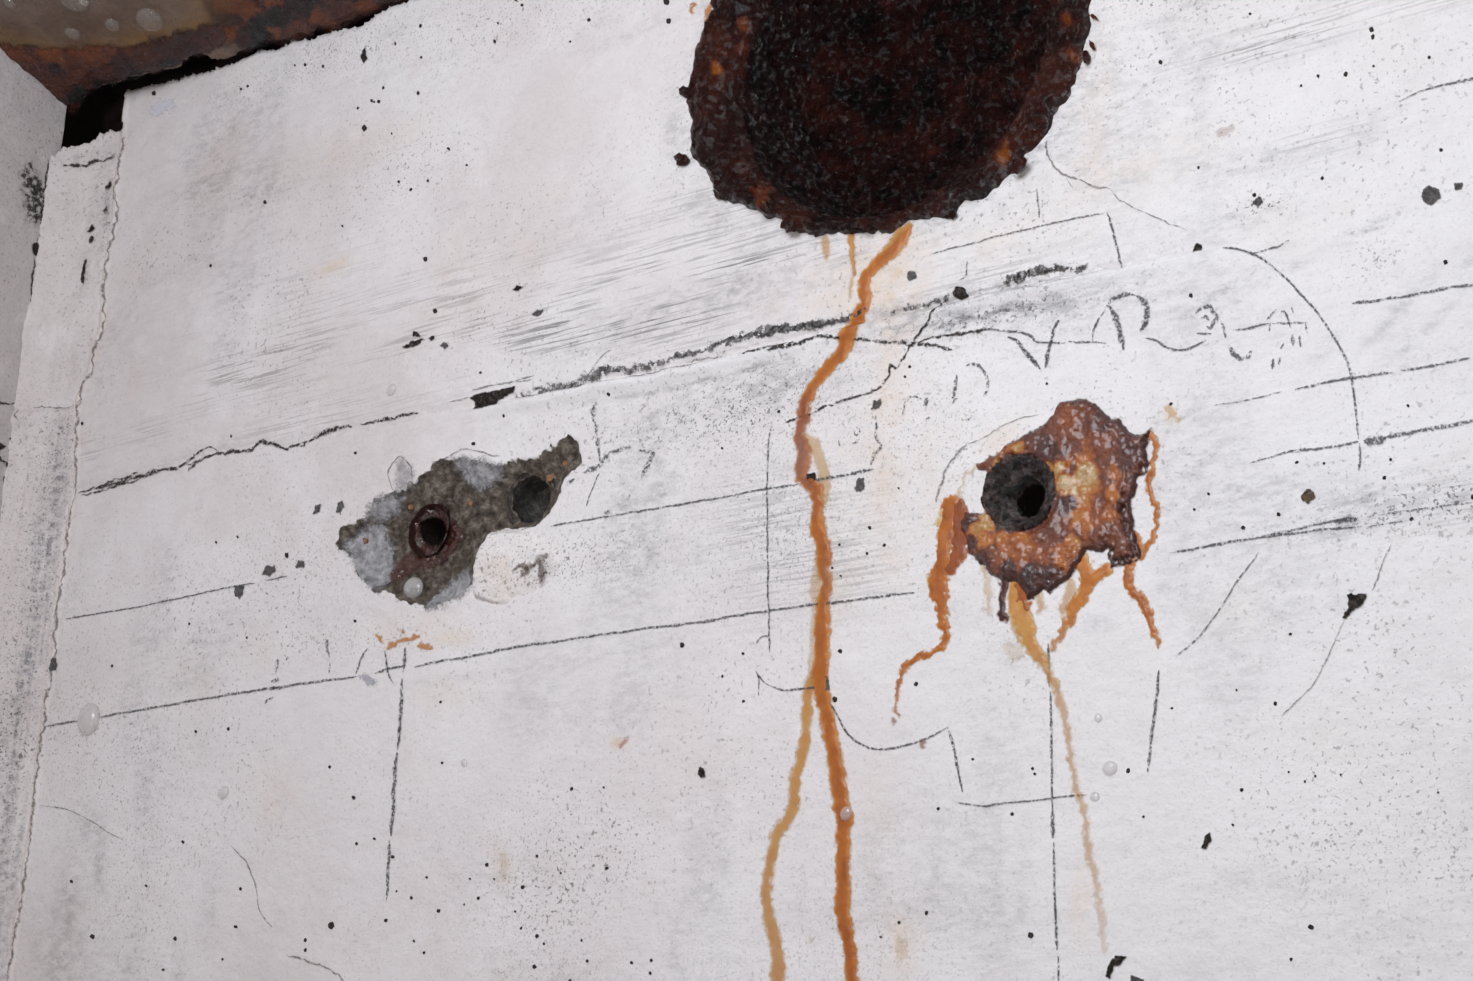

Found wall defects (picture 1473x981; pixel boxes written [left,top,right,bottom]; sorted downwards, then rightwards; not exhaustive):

corrosion [0,0,403,114]
corrosion [690,0,717,22]
corrosion [1083,40,1095,64]
corrosion [1011,156,1027,174]
crack [451,376,531,402]
crack [586,302,983,422]
crack [0,137,418,981]
crack [388,448,498,488]
spalling [312,434,582,609]
corrosion [761,217,912,981]
corrosion [894,399,1161,716]